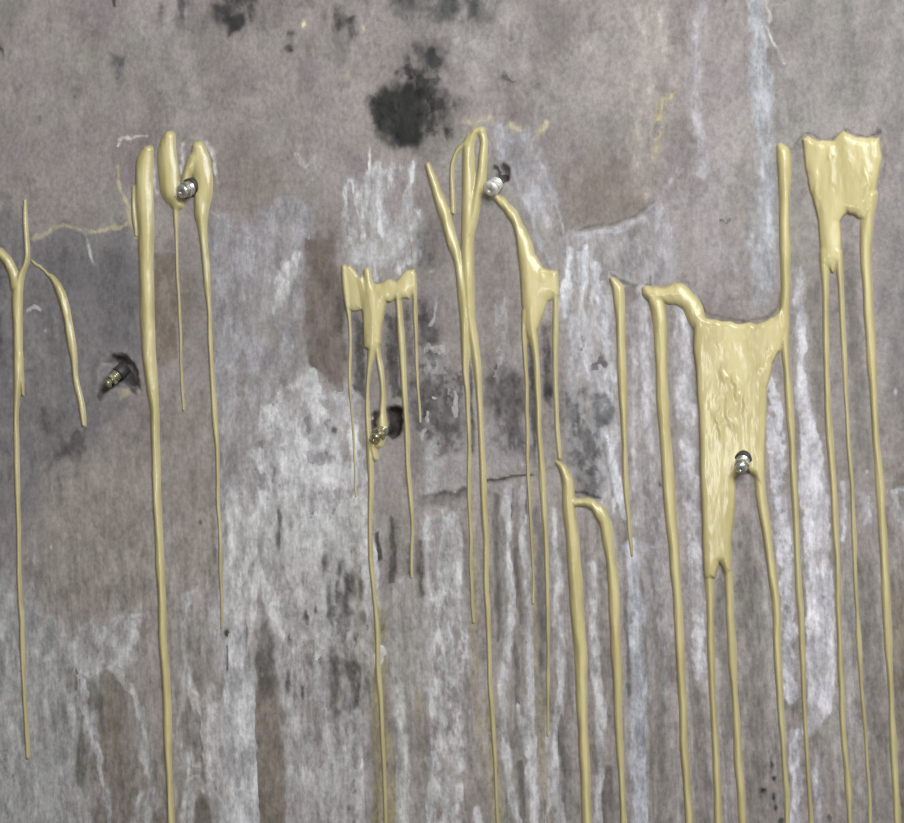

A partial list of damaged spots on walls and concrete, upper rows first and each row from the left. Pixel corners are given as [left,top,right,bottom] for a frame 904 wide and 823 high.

damp [460,0,904,823]
crack [414,463,557,511]
crack [575,489,603,501]